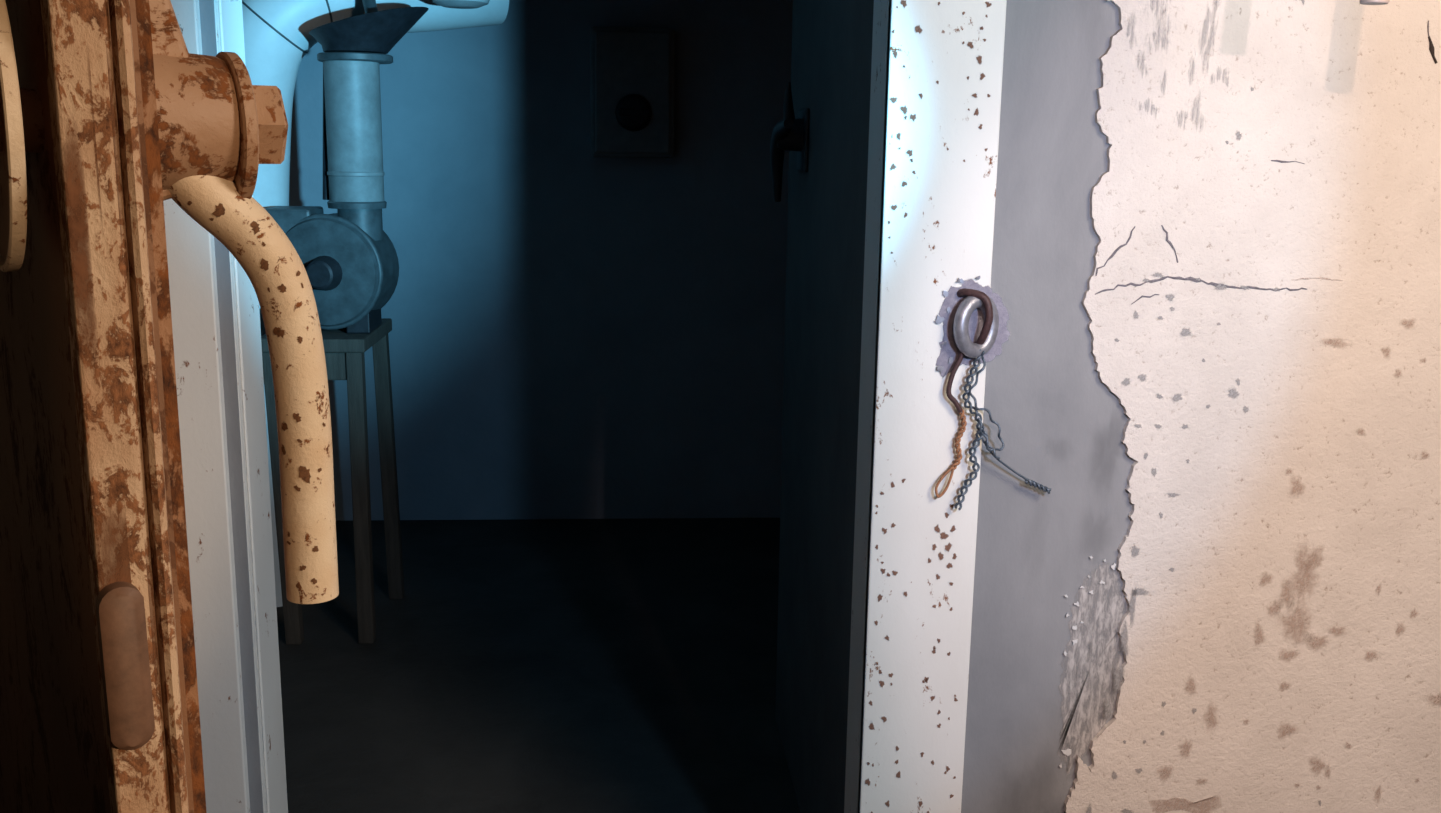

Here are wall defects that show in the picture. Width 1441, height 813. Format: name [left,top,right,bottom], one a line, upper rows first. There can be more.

rust [962,2,991,129]
rust [890,94,923,187]
crack [1095,225,1327,305]
rust [875,479,906,576]
rust [928,504,957,586]
peeling [1059,556,1146,773]